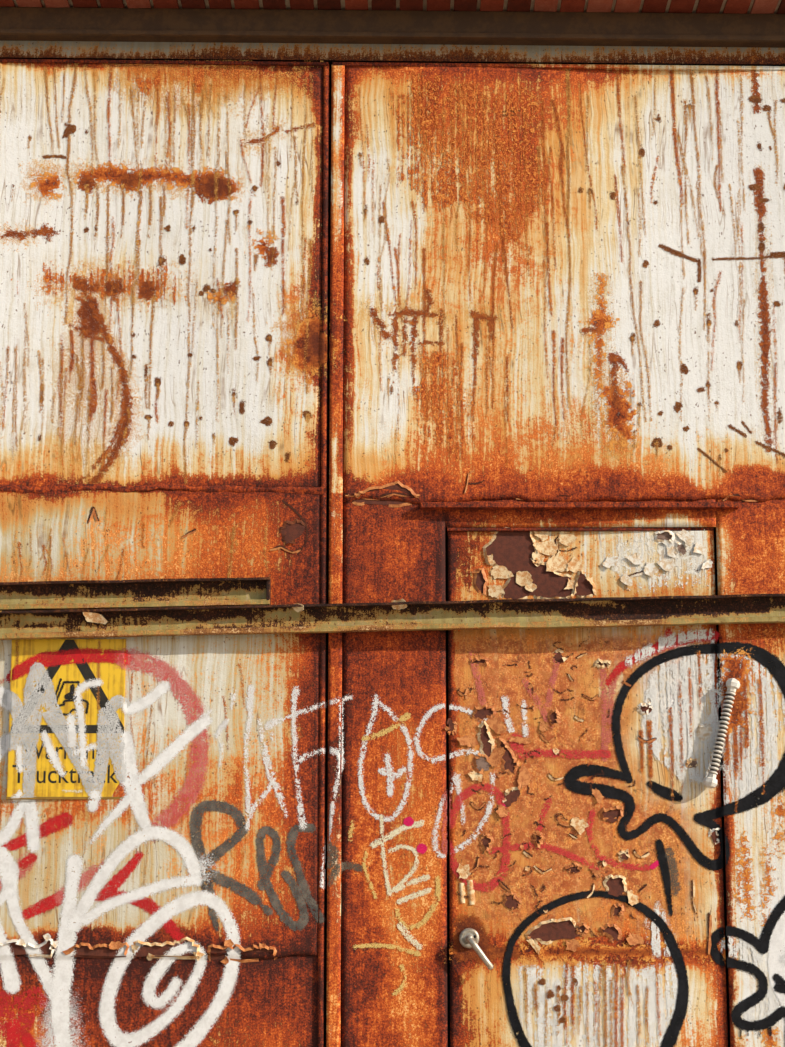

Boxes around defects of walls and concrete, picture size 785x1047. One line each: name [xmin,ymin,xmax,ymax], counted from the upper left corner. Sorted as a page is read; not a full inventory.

corrosion [0,60,785,498]
corrosion [13,506,125,582]
spalling [451,527,597,599]
peeling [597,529,713,592]
spalling [553,649,567,663]
spalling [593,658,611,669]
peeling [445,704,532,817]
spalling [592,789,623,823]
peeling [570,817,589,835]
peeling [456,863,470,879]
spalling [503,892,522,911]
corrosion [736,1026,782,1047]